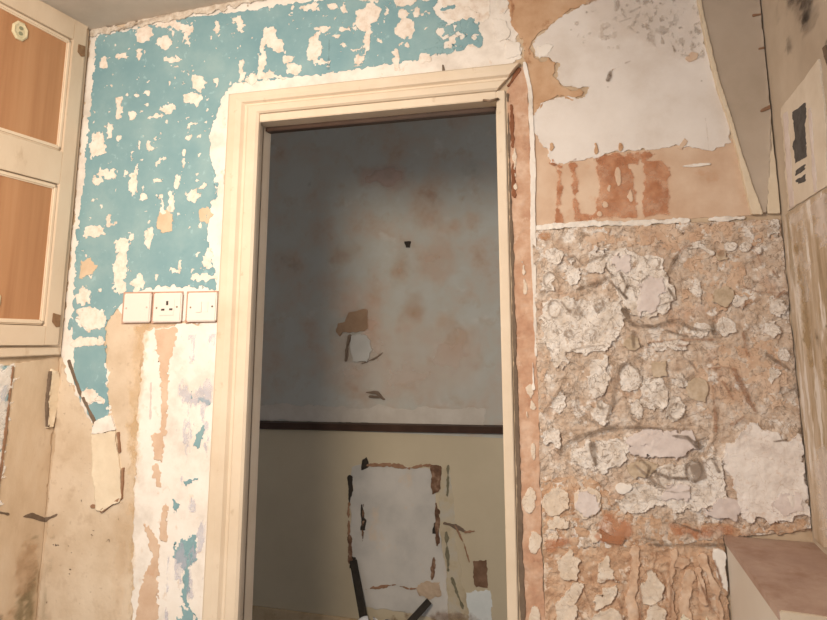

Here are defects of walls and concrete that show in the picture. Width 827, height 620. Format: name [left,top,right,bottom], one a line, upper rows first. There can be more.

spalling [534,133,750,226]
peeling [0,0,595,620]
crack [540,244,804,493]
leakage [15,545,36,620]